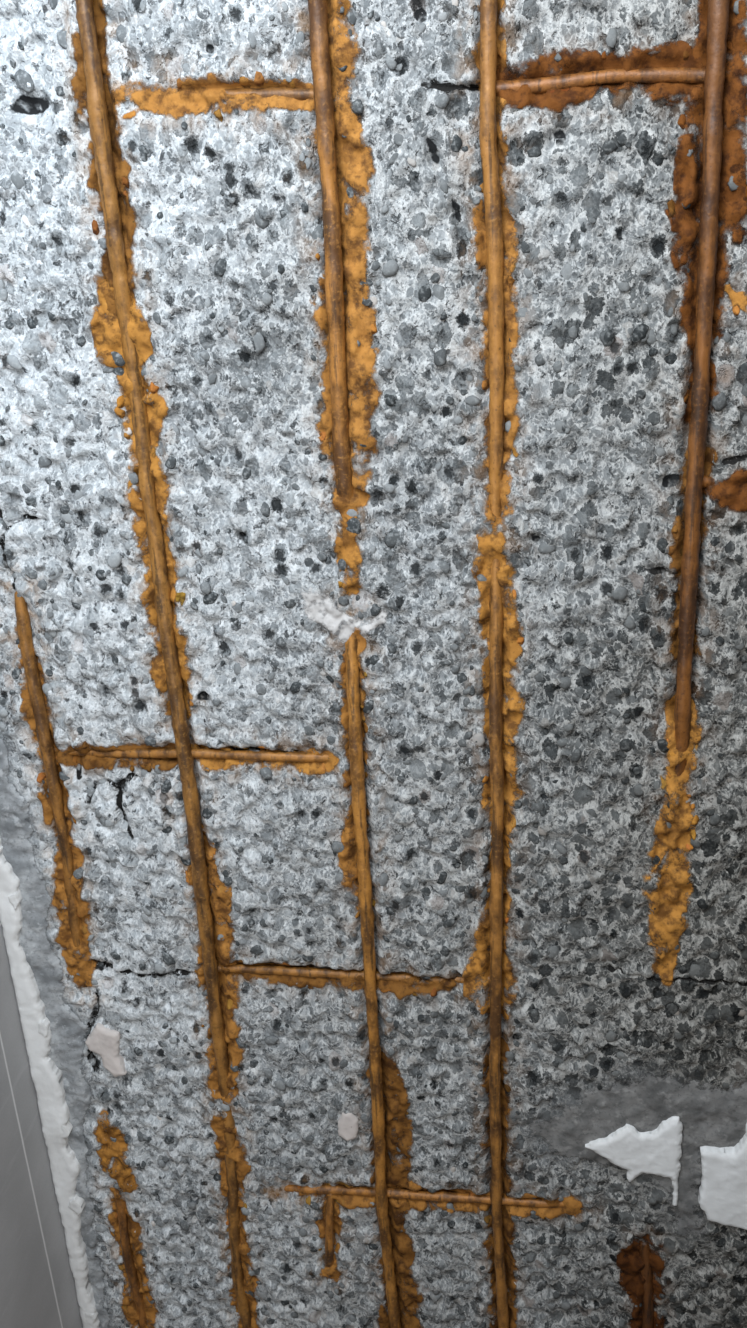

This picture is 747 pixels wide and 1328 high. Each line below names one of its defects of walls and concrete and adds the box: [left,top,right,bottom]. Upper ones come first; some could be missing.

spalling [499,0,700,76]
corrosion [712,0,747,339]
corrosion [70,0,315,719]
spalling [706,213,747,489]
spalling [0,0,388,1328]
corrosion [185,0,719,1328]
corrosion [668,446,747,659]
corrosion [15,627,376,988]
corrosion [93,1109,159,1328]
spalling [376,975,492,1195]
flaking render [585,1116,683,1206]
flaking render [691,1123,747,1230]